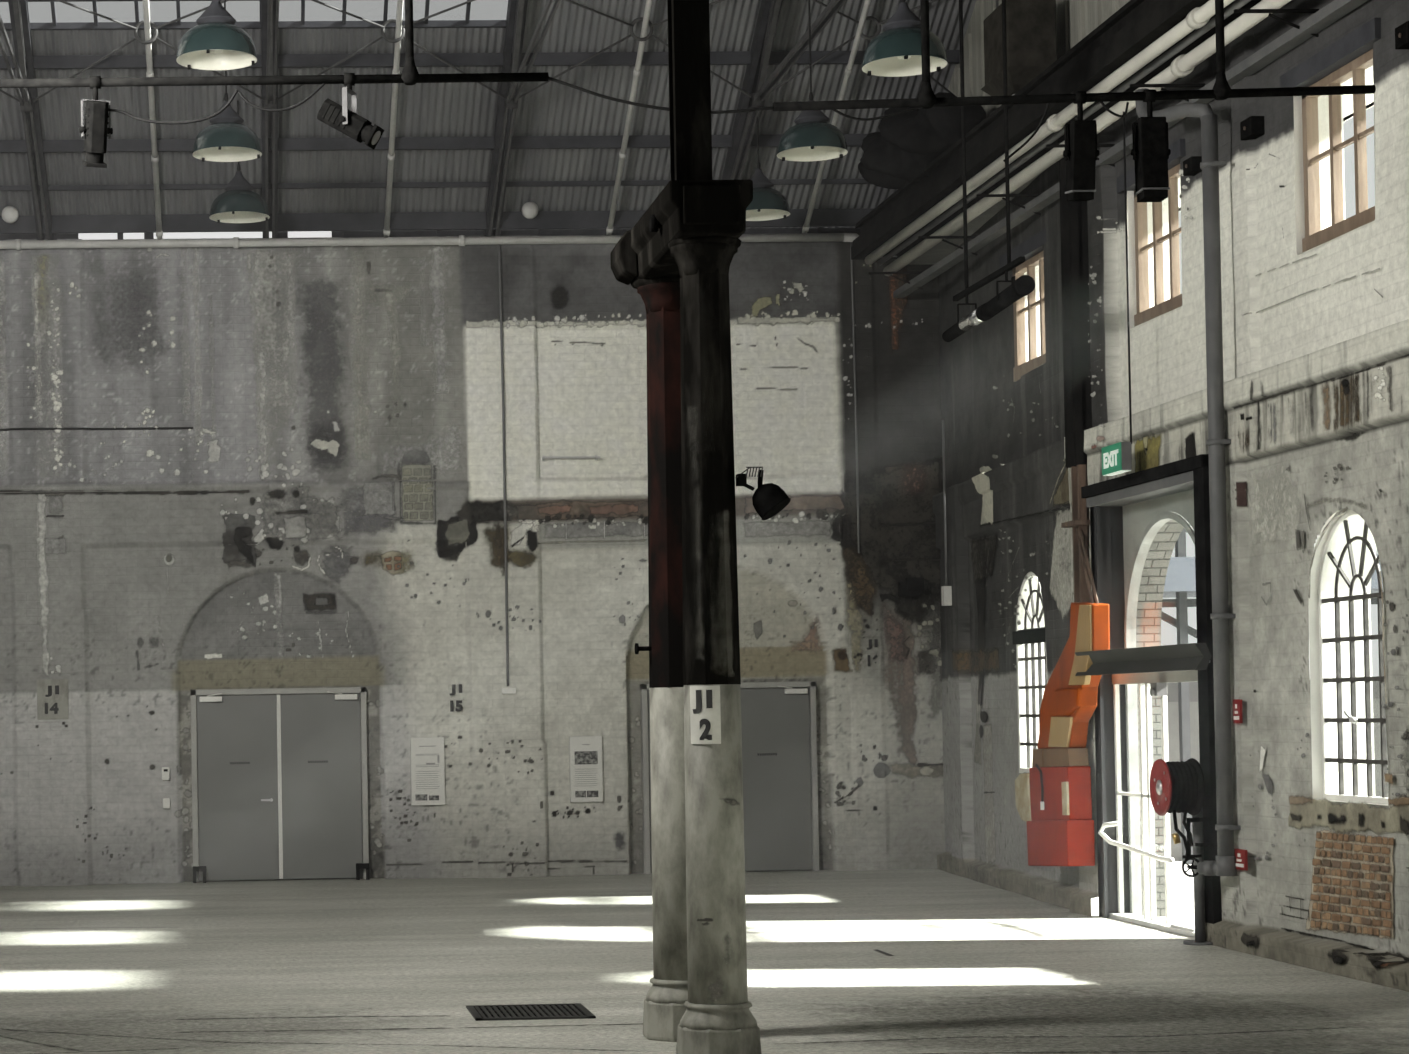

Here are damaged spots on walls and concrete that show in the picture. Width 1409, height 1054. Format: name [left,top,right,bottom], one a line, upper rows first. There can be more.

damp [247,247,461,477]
flaking render [220,410,354,658]
flaking render [364,449,478,604]
peeling [476,605,541,630]
damp [918,650,942,682]
damp [1401,727,1409,798]
flaking render [1299,830,1408,969]